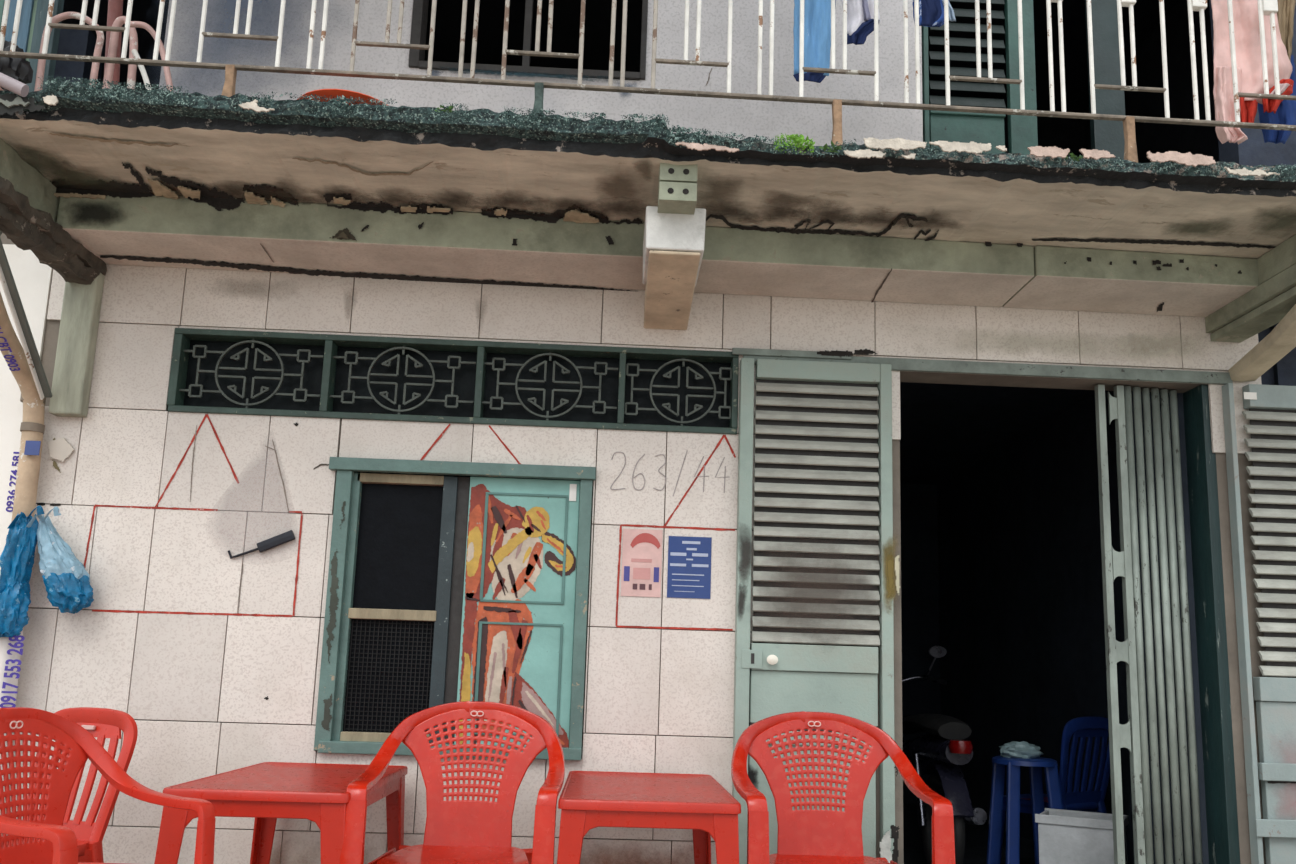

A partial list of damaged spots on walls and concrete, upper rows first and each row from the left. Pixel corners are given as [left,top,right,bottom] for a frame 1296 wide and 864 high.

leakage [49,133,178,147]
flaking render [675,142,739,153]
flaking render [843,137,1007,159]
flaking render [1027,146,1115,160]
leakage [292,158,432,176]
flaking render [1147,151,1280,177]
spalling [50,162,299,211]
leakage [551,163,648,215]
leakage [436,194,471,208]
leakage [768,195,953,227]
leakage [1174,223,1226,234]
leakage [1263,212,1296,230]